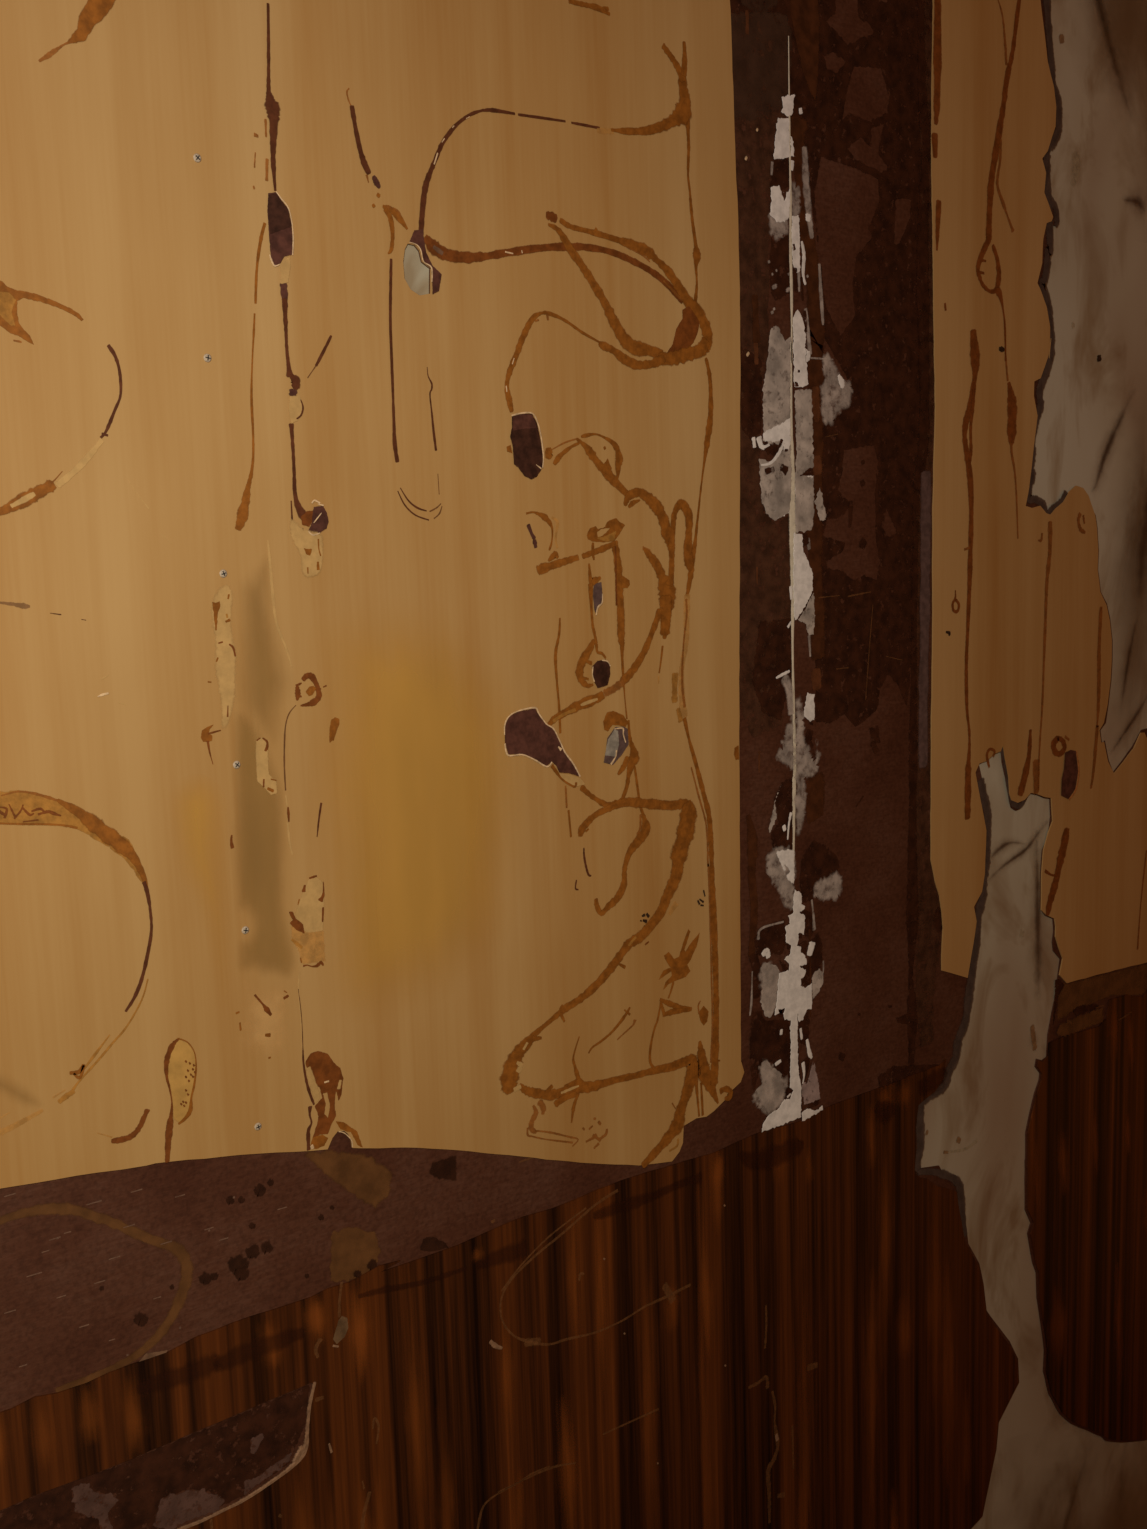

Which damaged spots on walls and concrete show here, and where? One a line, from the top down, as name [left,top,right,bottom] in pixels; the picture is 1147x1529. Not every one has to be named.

crack [253,3,280,191]
crack [686,119,701,302]
crack [0,344,122,515]
peeling [749,36,852,1132]
peeling [504,707,585,788]
crack [672,358,720,1086]
peeling [1061,750,1080,800]
crack [111,1109,150,1143]
peeling [0,1382,316,1529]